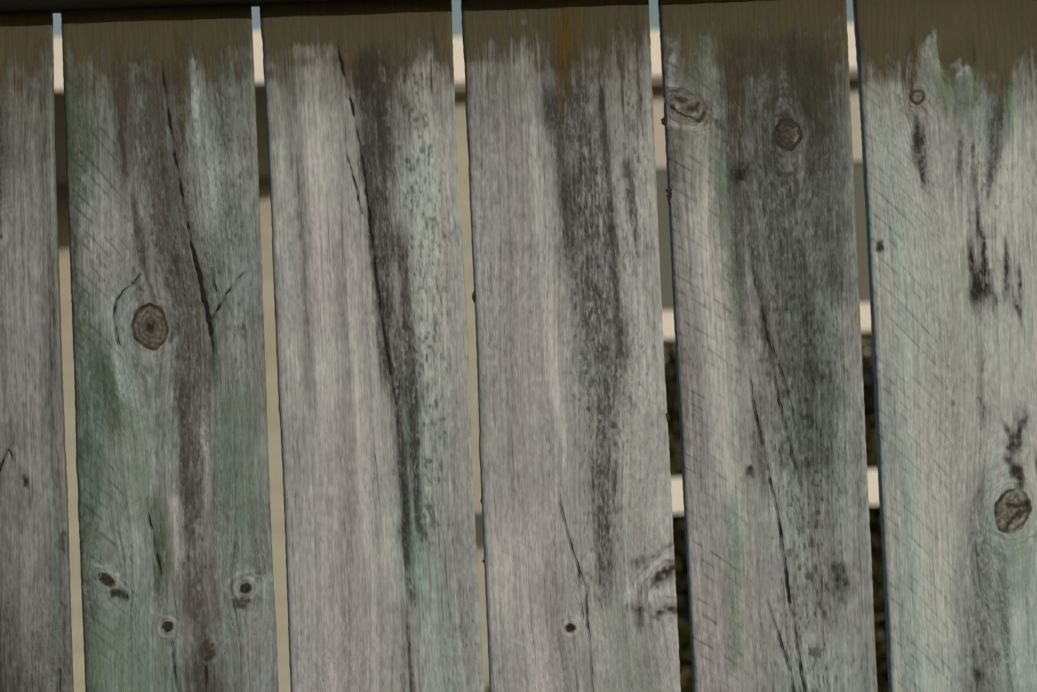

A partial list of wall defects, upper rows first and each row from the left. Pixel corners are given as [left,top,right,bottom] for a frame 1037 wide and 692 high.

crack [162,61,243,352]
water stain [0,0,651,692]
crack [747,236,806,692]
water stain [659,0,1037,195]
water stain [969,212,1022,304]